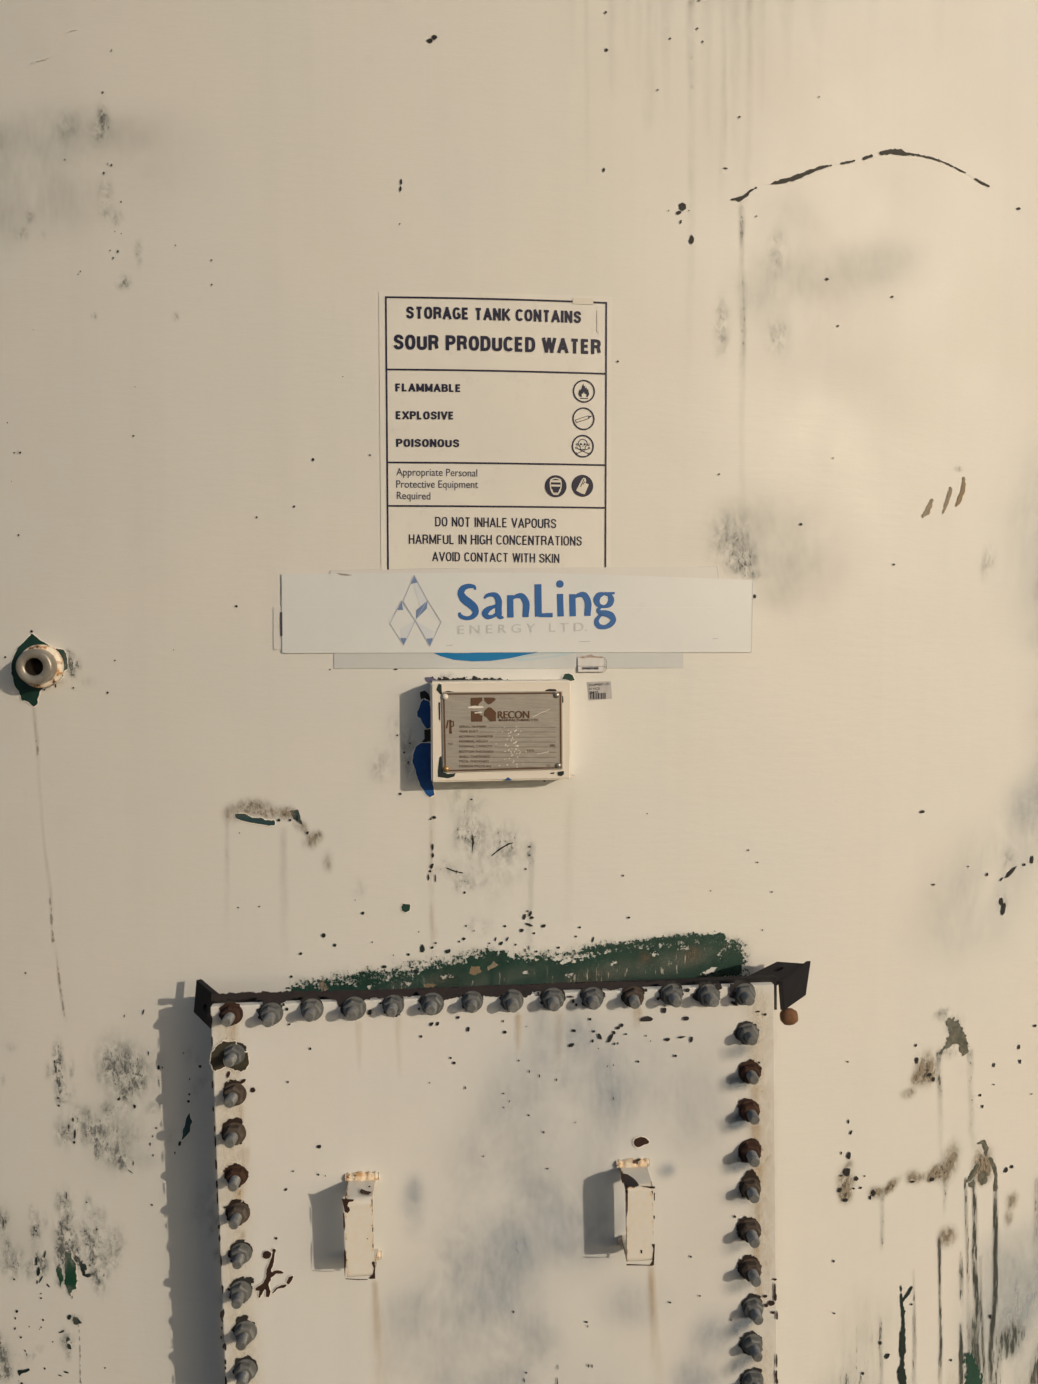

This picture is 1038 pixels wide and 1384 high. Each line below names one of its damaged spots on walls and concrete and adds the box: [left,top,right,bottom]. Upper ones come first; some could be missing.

crack [731,149,990,202]
peeling [4,630,79,708]
peeling [227,802,321,845]
peeling [174,910,767,1384]
peeling [967,1140,1015,1221]
peeling [730,1278,778,1321]
peeling [738,1331,778,1384]
peeling [963,1351,983,1384]